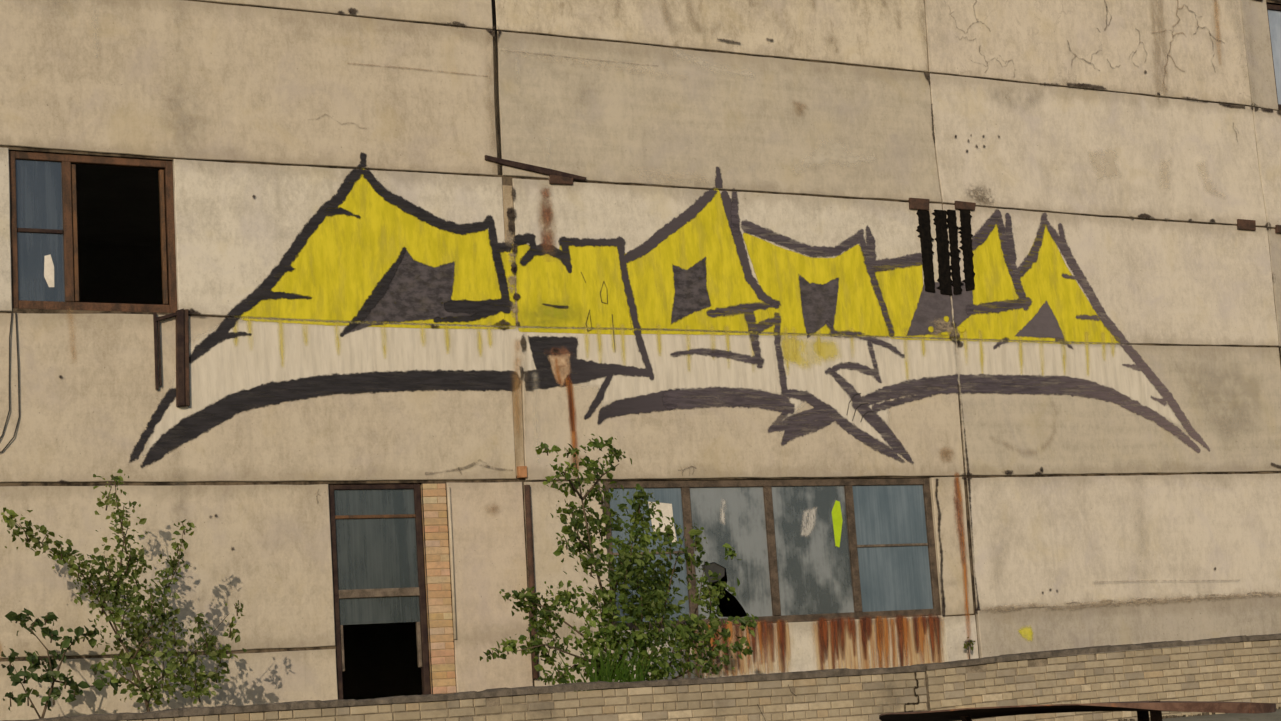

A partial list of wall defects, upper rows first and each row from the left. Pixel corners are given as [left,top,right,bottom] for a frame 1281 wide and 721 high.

corrosion [542,190,552,249]
corrosion [565,375,580,473]
corrosion [954,474,969,620]
corrosion [686,621,790,678]
corrosion [814,616,942,670]
crack [904,672,931,712]